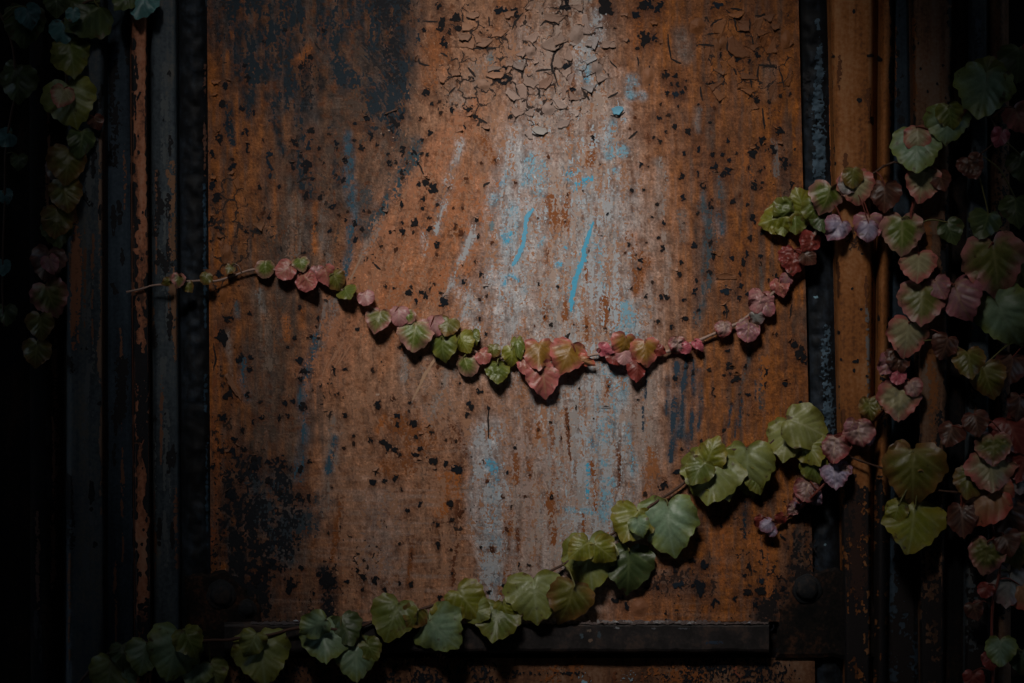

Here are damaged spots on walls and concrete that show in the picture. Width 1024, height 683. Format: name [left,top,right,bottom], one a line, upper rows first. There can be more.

corrosion [154,160,178,362]
peeling [368,0,715,599]
corrosion [534,297,568,327]
corrosion [537,192,574,261]
corrosion [583,295,610,342]
corrosion [529,408,572,461]
corrosion [375,396,485,587]
corrosion [489,494,521,595]
corrosion [544,465,560,546]
corrosion [581,461,598,532]